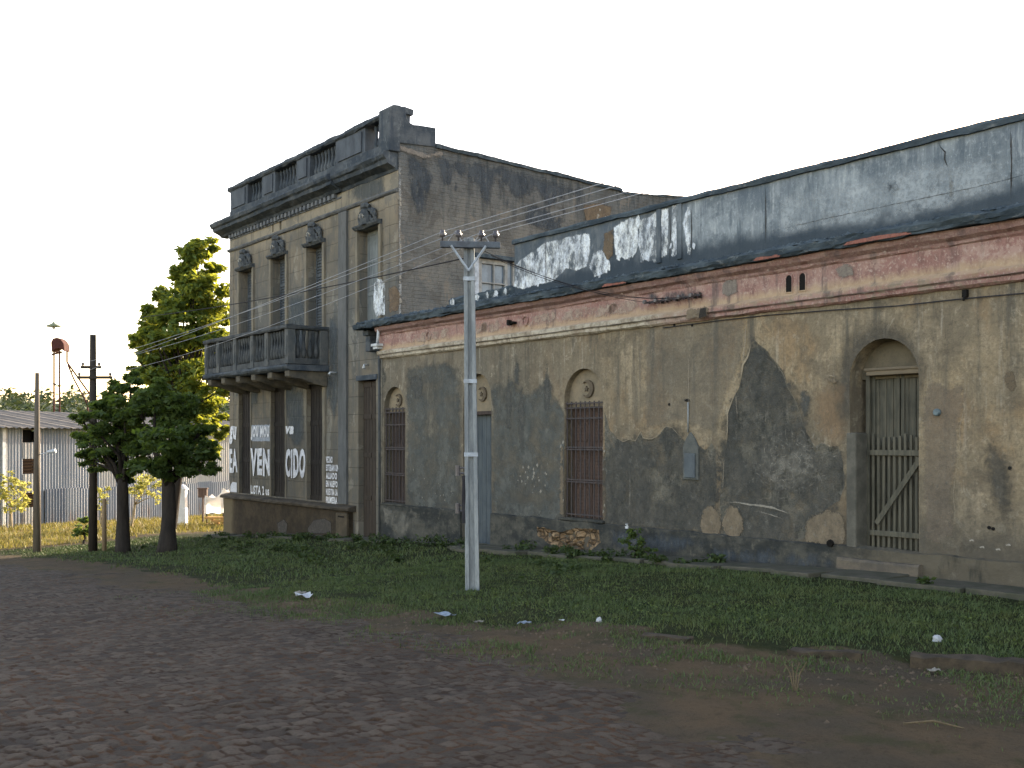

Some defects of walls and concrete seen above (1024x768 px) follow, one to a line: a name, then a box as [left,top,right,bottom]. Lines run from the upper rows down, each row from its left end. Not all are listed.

peeling [373,168,402,315]
water stain [408,158,581,230]
peeling [475,203,695,300]
water stain [383,363,460,532]
water stain [491,363,564,519]
flaking render [602,339,847,541]